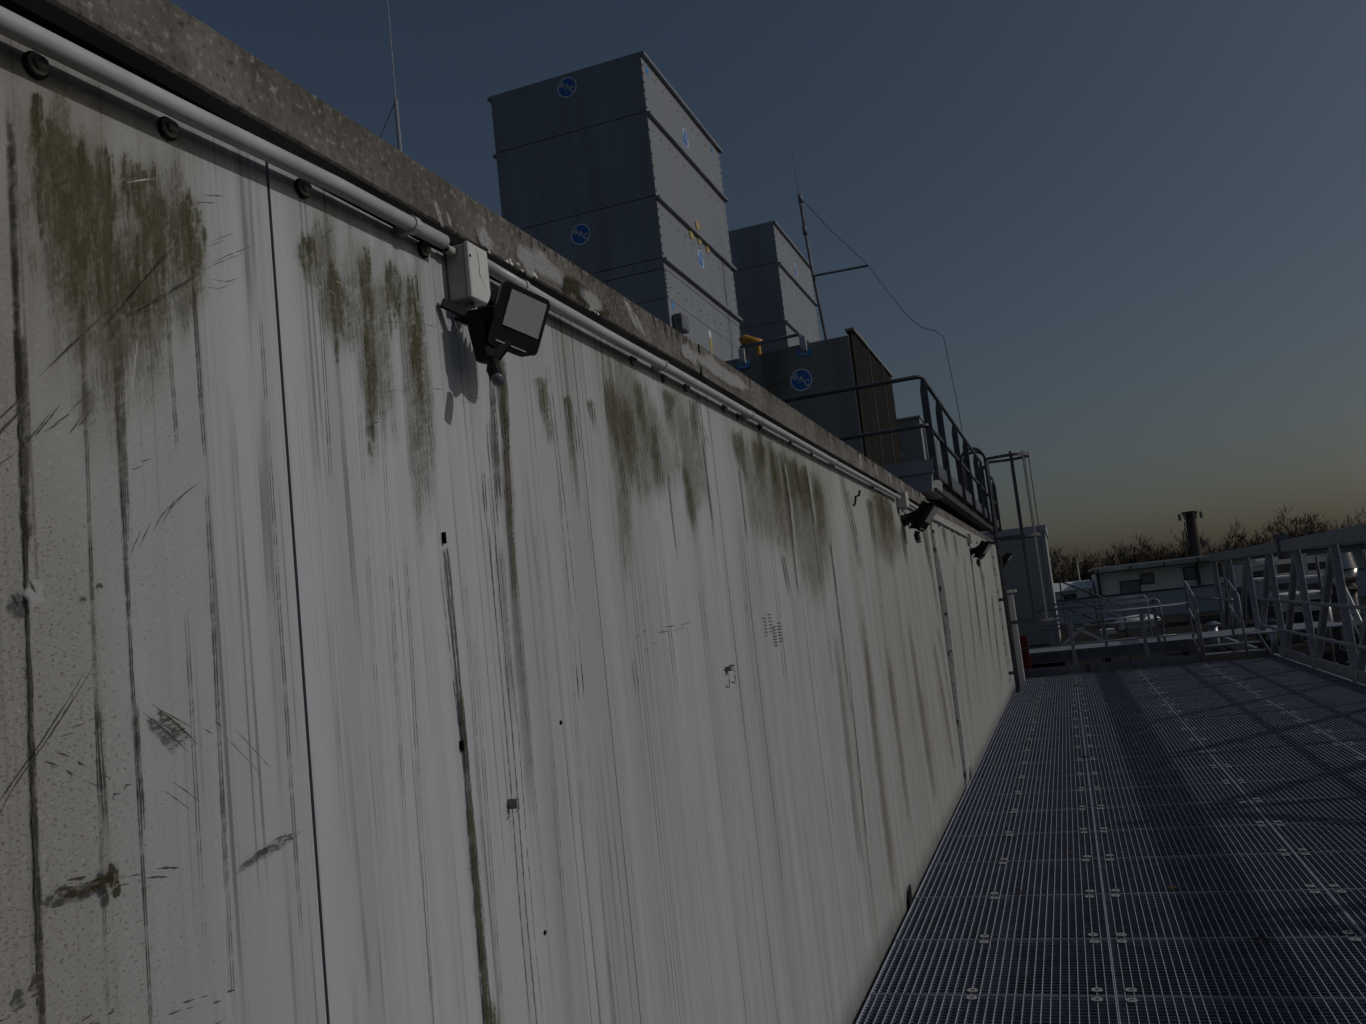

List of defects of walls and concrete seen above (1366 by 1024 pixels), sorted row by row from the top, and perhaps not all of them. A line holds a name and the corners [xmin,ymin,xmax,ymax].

damp [207,489,235,994]
damp [277,559,303,933]
damp [299,231,437,837]
damp [539,366,716,688]